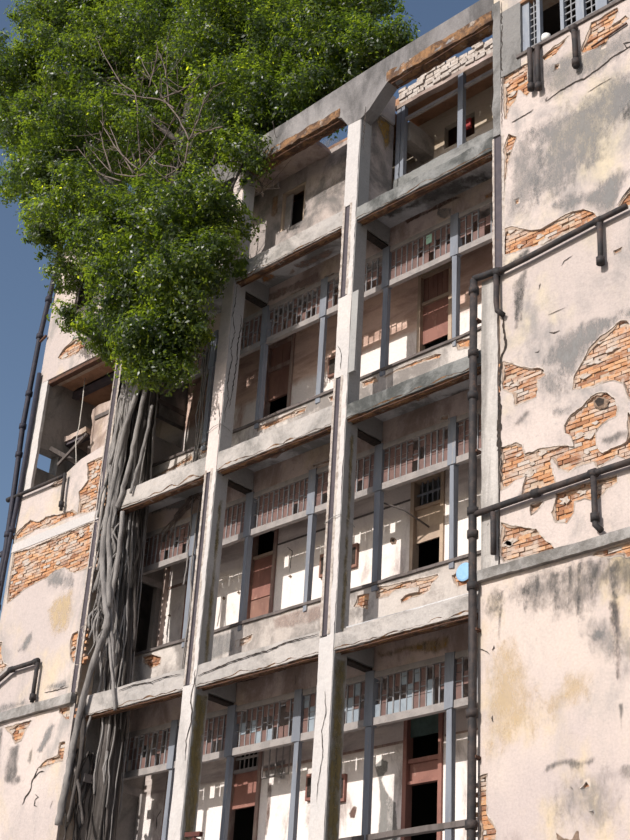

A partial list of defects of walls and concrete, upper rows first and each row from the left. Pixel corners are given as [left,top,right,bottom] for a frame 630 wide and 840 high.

flaking render [580,7,629,54]
flaking render [502,63,530,119]
flaking render [235,134,598,300]
crack [218,288,242,434]
flaking render [499,319,630,524]
flaking render [3,358,123,693]
spalling [59,363,481,721]
flaking render [499,522,555,562]
damp [524,558,630,608]
damp [7,746,18,782]
crack [23,769,52,807]
flaking render [476,773,497,840]